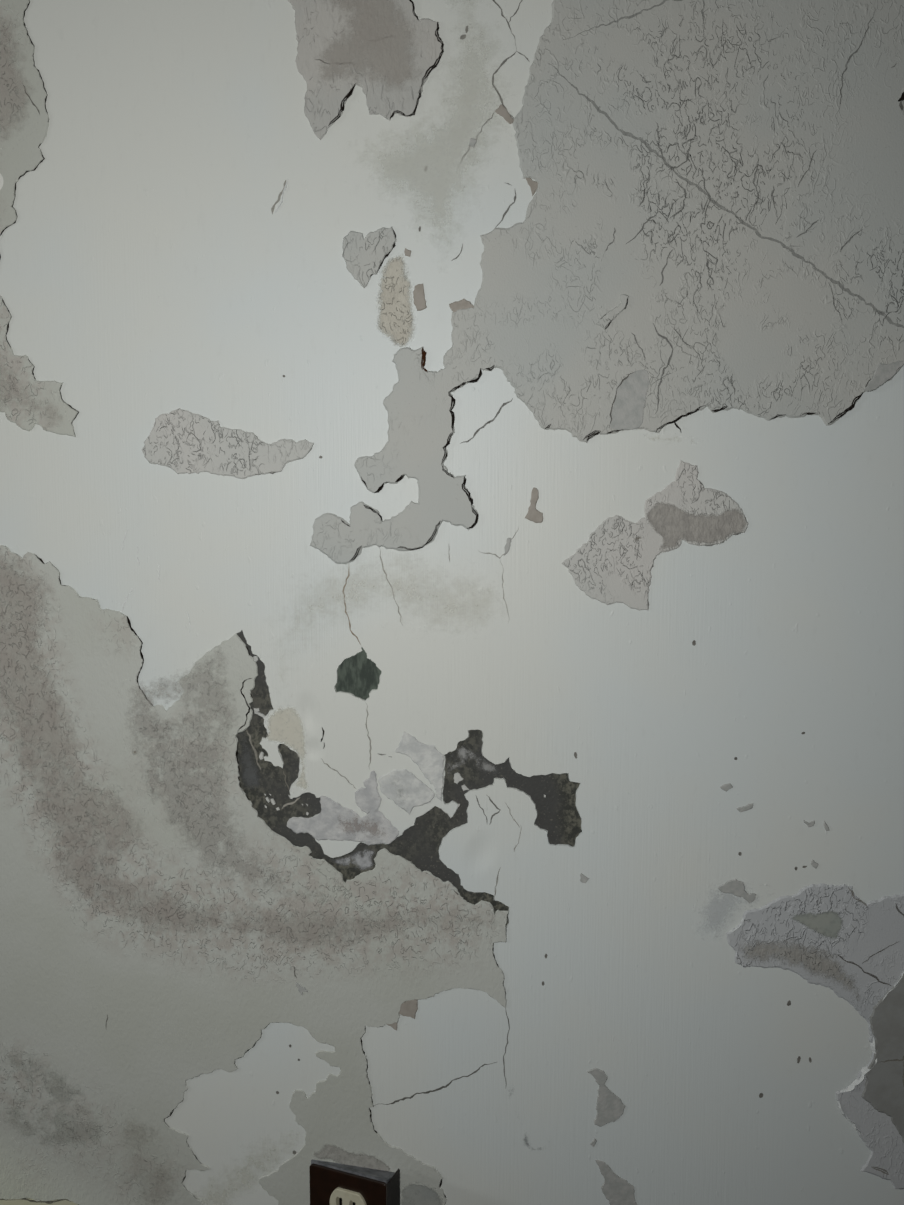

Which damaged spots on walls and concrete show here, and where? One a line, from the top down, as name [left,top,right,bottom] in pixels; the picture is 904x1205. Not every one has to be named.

peeling [0,0,49,236]
crack [457,0,530,170]
peeling [0,296,79,437]
peeling [142,408,322,479]
crack [495,183,516,228]
peeling [288,0,904,564]
leakage [269,708,304,758]
peeling [0,545,582,1205]
crack [374,1012,510,1106]
peeling [718,879,904,1189]